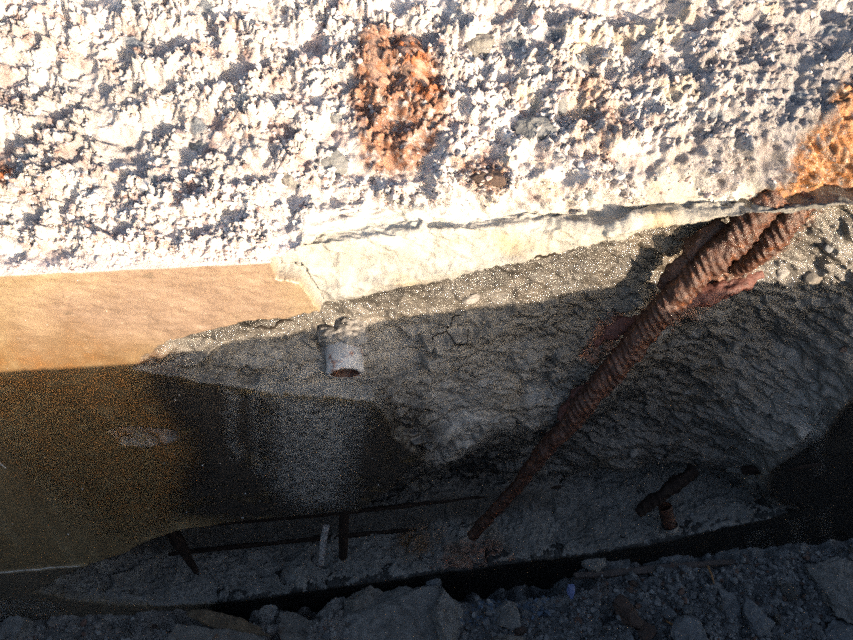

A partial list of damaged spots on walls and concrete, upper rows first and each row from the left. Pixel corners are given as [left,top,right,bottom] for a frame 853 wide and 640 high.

rust [0,162,10,185]
rust [349,24,447,176]
rust [775,83,853,203]
water stain [150,374,435,522]
spalling [36,167,853,606]